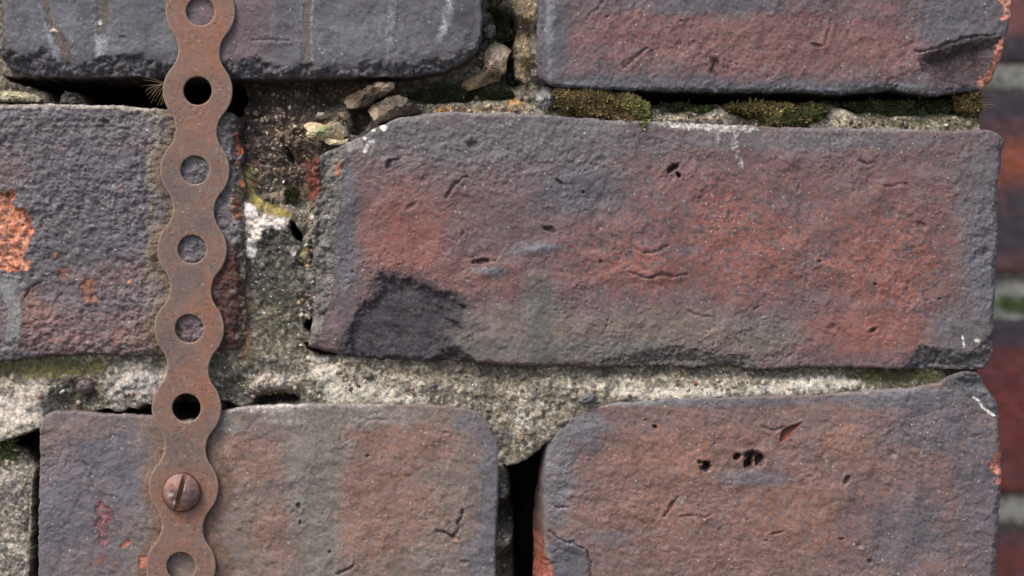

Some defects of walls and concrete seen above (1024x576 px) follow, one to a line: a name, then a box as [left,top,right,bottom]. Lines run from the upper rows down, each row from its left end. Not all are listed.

spalling [999,0,1011,21]
spalling [0,189,34,273]
corrosion [146,109,176,356]
corrosion [213,253,250,360]
corrosion [203,439,233,576]